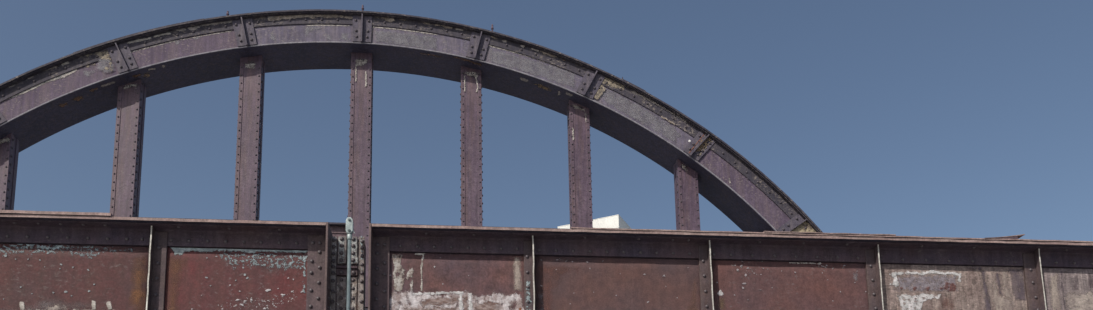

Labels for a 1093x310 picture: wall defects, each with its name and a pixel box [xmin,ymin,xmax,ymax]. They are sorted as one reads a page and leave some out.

peeling [0,244,133,271]
peeling [172,248,308,310]
peeling [389,253,532,310]
peeling [889,269,962,310]